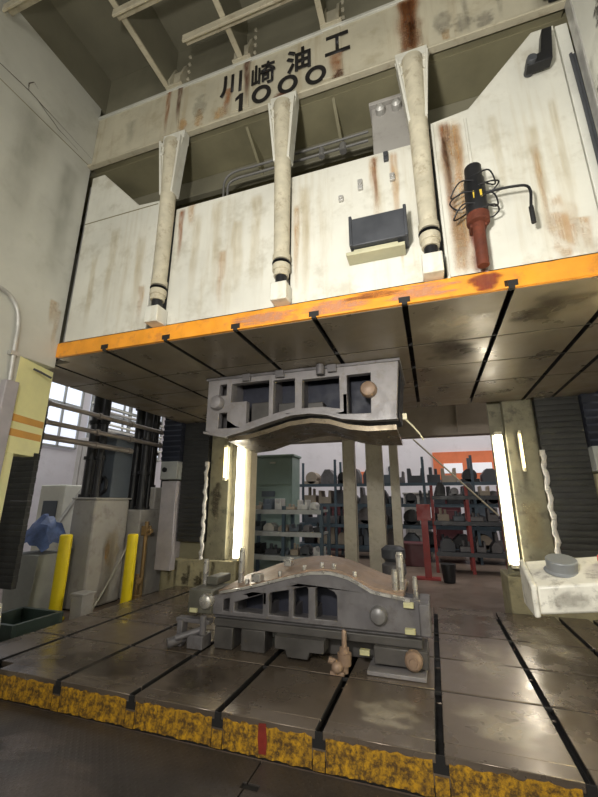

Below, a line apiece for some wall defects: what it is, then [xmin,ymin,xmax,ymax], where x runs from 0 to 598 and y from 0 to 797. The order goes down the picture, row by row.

rust [399,0,419,51]
rust [440,126,465,212]
rust [470,261,500,291]